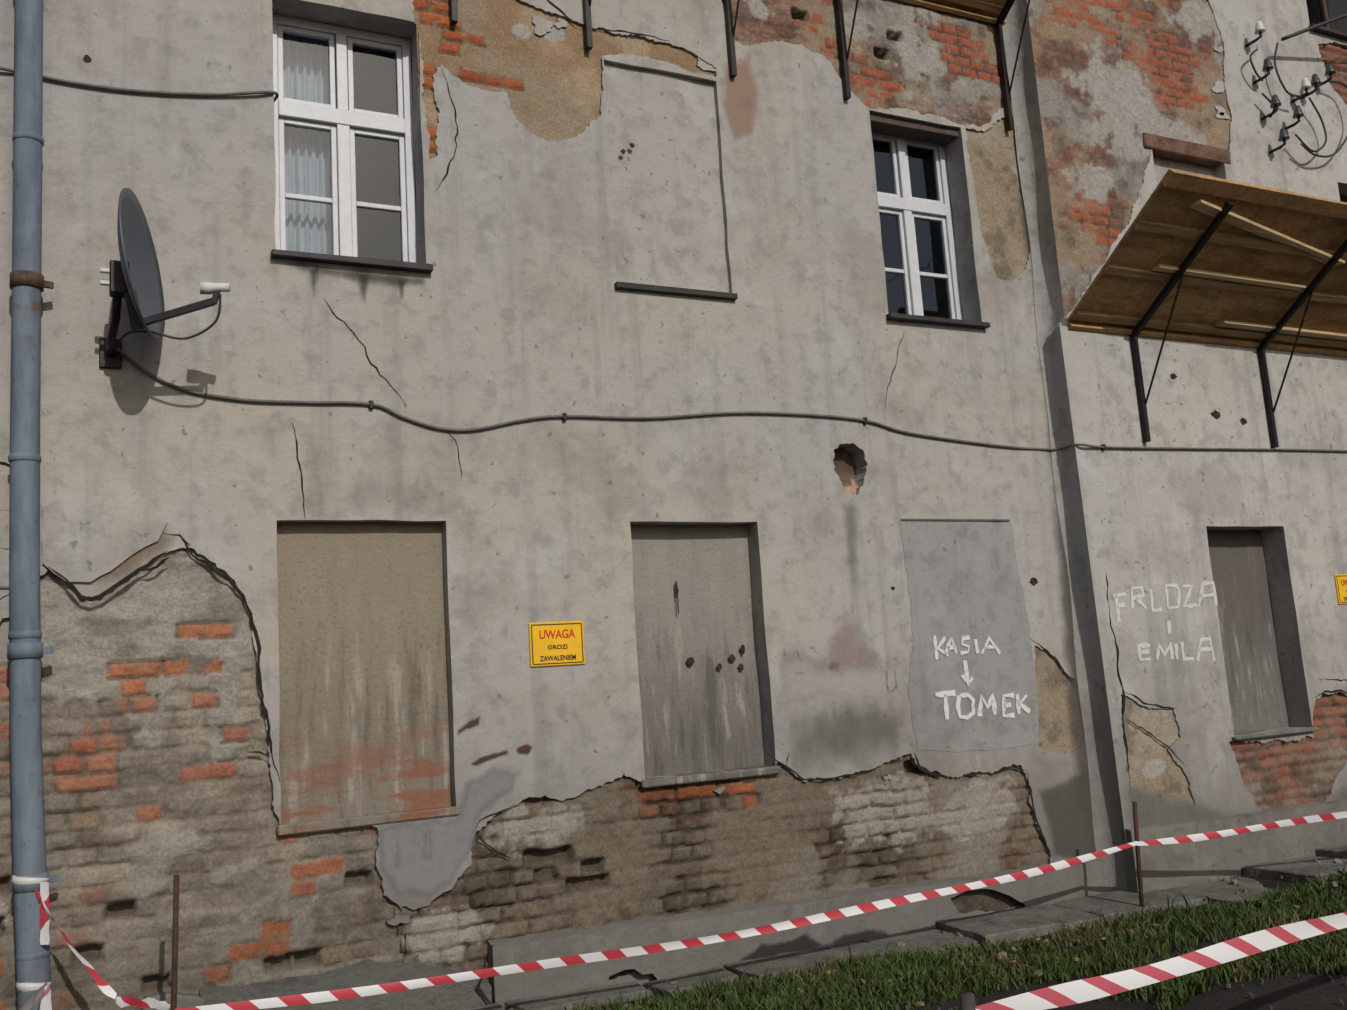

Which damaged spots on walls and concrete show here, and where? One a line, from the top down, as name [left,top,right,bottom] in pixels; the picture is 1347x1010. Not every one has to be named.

flaking render [412,0,716,159]
peeling [721,0,1031,281]
peeling [1027,0,1231,317]
crack [324,298,406,405]
flaking render [0,473,10,588]
crack [292,423,305,516]
spalling [833,447,858,495]
crack [48,532,280,782]
flaking render [0,618,17,1010]
flaking render [40,548,1048,1010]
flaking render [1121,695,1194,804]
flaking render [1229,692,1347,809]